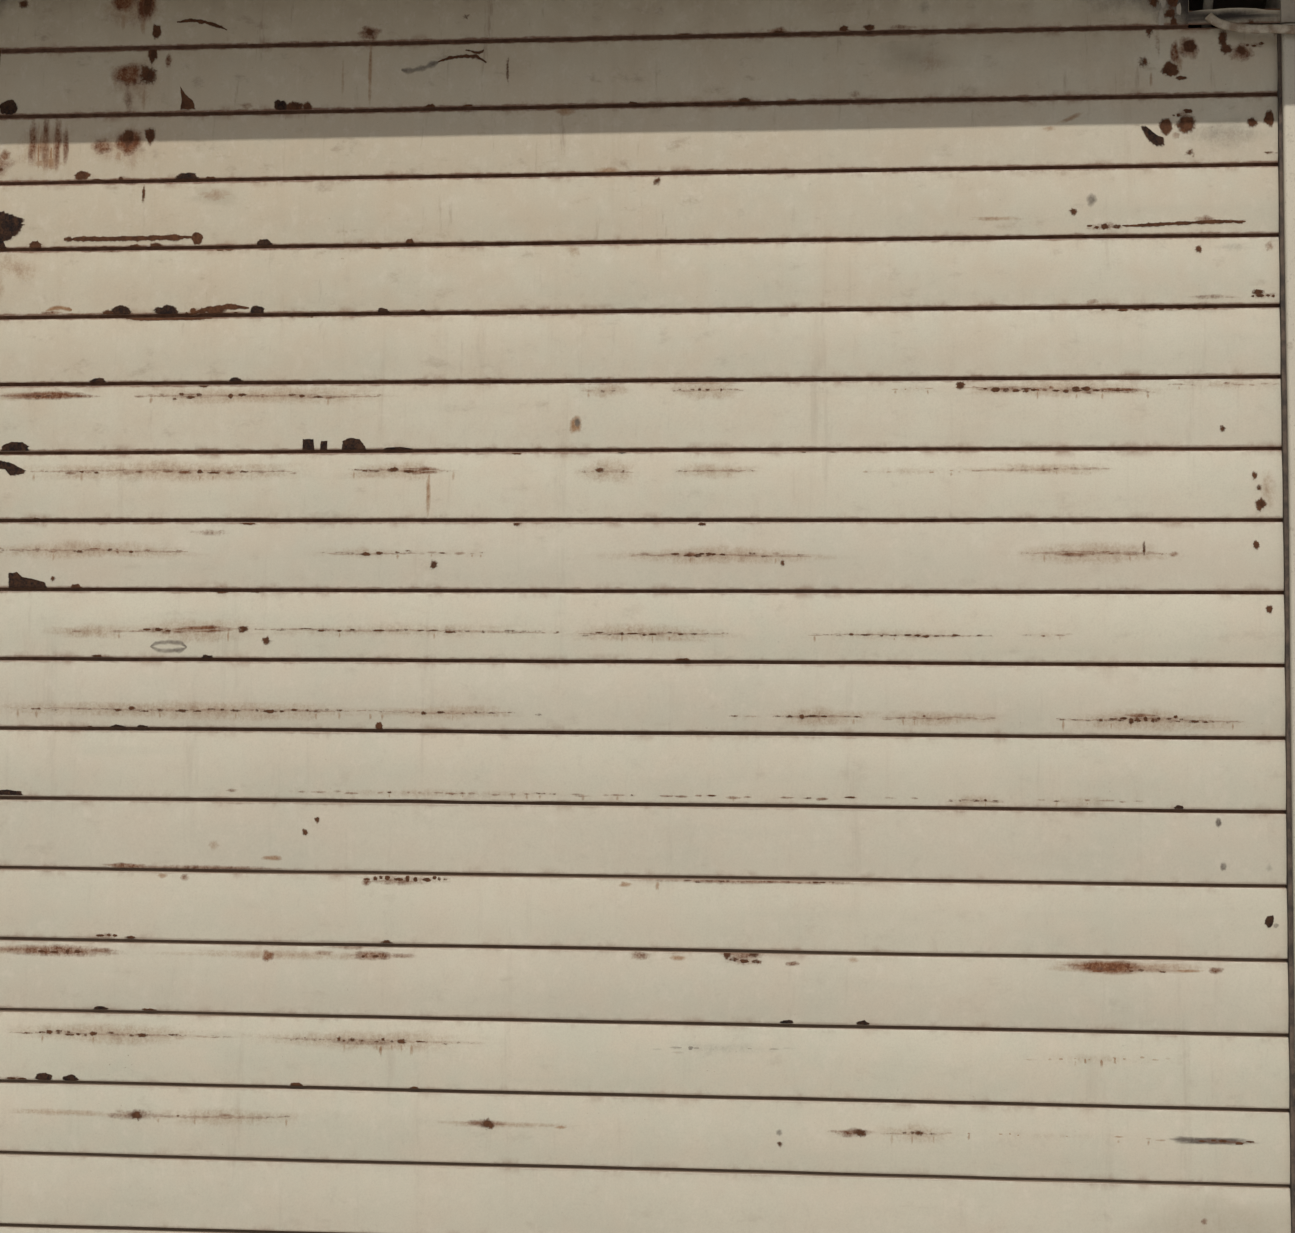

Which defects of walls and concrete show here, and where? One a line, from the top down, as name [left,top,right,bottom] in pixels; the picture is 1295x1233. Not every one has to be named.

corrosion [1134,0,1277,88]
corrosion [0,0,174,180]
corrosion [1139,108,1199,148]
corrosion [1068,192,1276,255]
corrosion [63,302,266,321]
corrosion [574,383,638,402]
corrosion [655,382,750,404]
corrosion [881,379,1281,401]
corrosion [978,536,1216,569]
corrosion [722,703,1021,731]
corrosion [1039,705,1274,735]
corrosion [1028,959,1225,977]